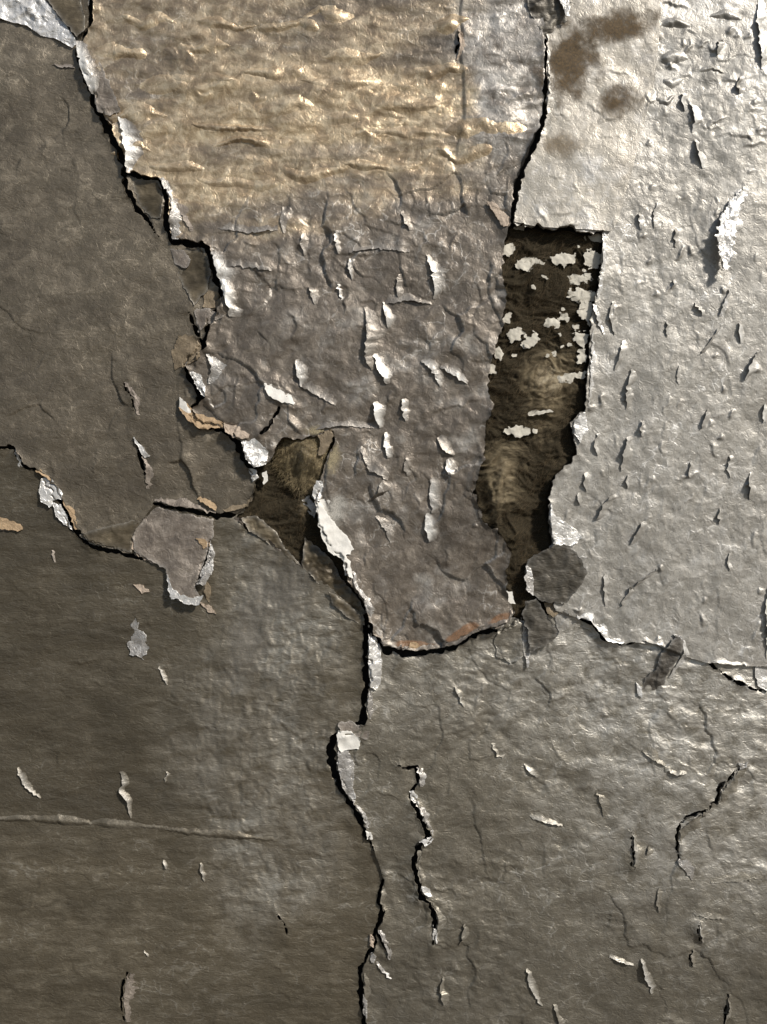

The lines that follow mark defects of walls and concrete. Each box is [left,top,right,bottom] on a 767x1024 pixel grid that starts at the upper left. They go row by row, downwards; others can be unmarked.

water stain [539,10,658,99]
crack [510,0,571,225]
water stain [602,84,634,118]
peeling [714,186,750,270]
crack [0,0,295,560]
peeling [573,411,588,443]
peeling [131,507,216,614]
peeling [127,618,149,660]
crack [577,613,665,647]
spalling [636,634,689,697]
crack [326,609,513,847]
crack [397,765,447,943]